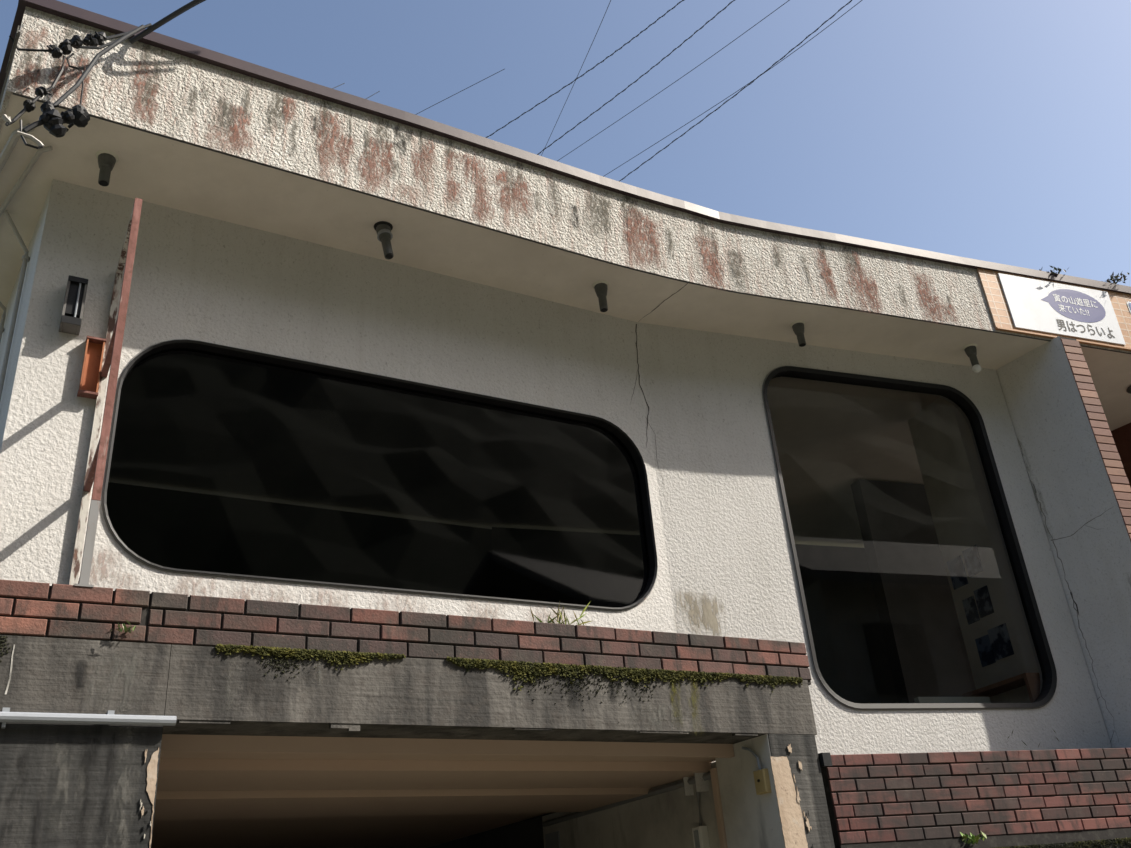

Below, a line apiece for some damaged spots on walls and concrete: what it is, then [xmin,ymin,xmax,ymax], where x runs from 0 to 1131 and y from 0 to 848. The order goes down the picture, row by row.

rust [15,28,90,106]
rust [212,86,253,148]
rust [319,101,393,189]
rust [401,132,529,220]
rust [622,196,659,263]
rust [815,243,880,309]
rust [914,274,957,321]
crack [631,283,688,487]
leakage [680,594,721,636]
crack [1024,461,1119,743]
leakage [77,727,130,848]
peeling [140,748,159,848]